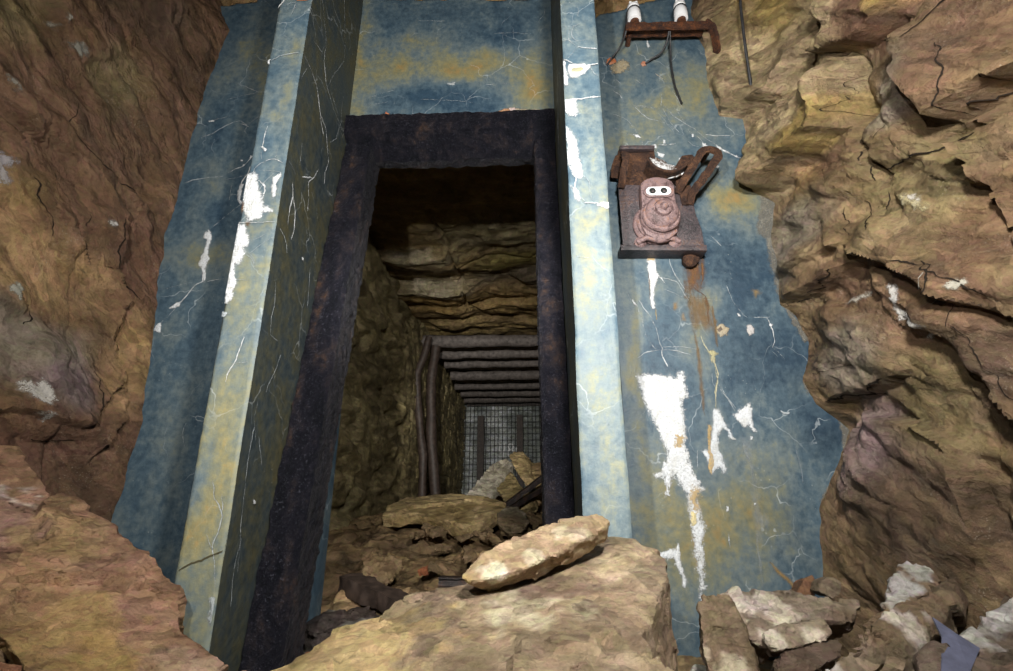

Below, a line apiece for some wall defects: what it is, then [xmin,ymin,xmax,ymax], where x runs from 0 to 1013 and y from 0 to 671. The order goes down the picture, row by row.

corrosion [686,259,718,346]